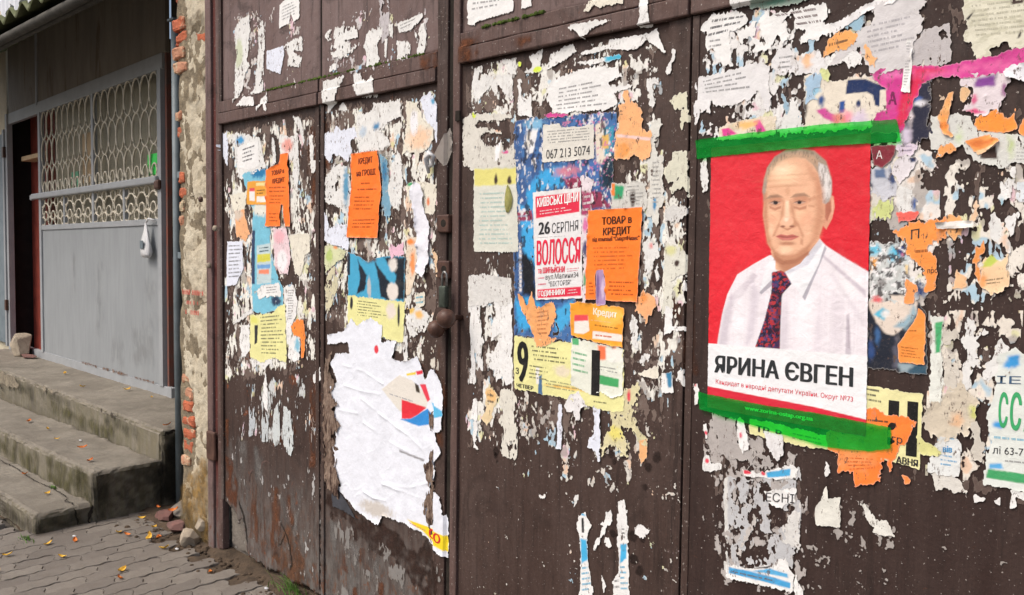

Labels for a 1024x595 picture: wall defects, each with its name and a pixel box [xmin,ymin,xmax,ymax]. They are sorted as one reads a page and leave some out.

flaking render [172,10,205,102]
flaking render [181,374,196,466]
corrosion [271,488,305,582]